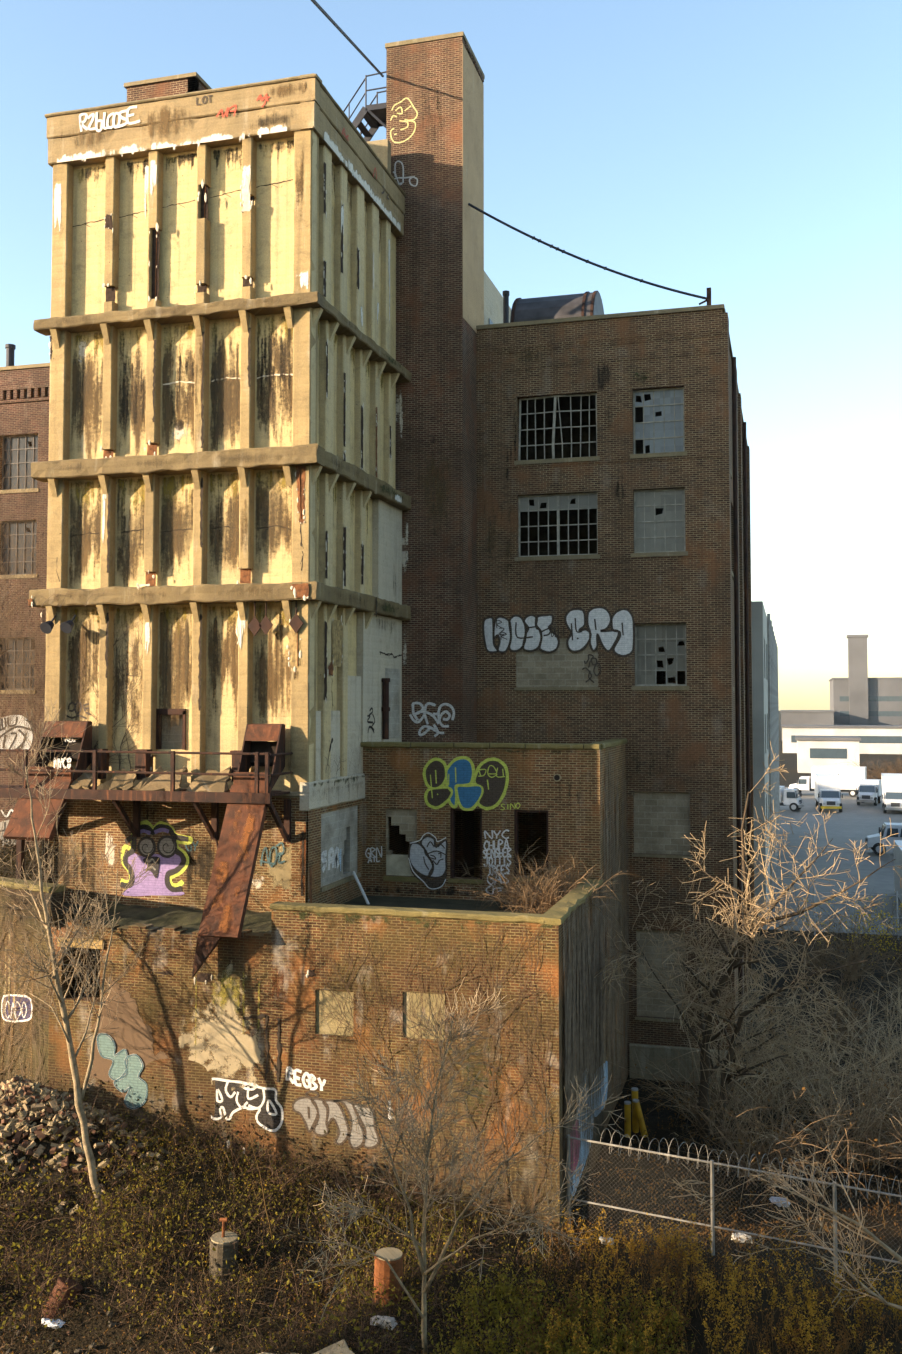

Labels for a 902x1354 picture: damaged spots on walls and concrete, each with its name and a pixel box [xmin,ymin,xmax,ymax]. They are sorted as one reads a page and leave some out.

damp [57,107,304,217]
damp [119,357,146,436]
damp [167,337,240,443]
damp [260,328,293,428]
damp [70,489,145,569]
damp [161,488,193,553]
damp [210,487,288,558]
damp [68,620,97,720]
damp [115,612,192,739]
damp [208,610,291,722]
rust [212,806,254,933]
spalling [194,973,212,985]